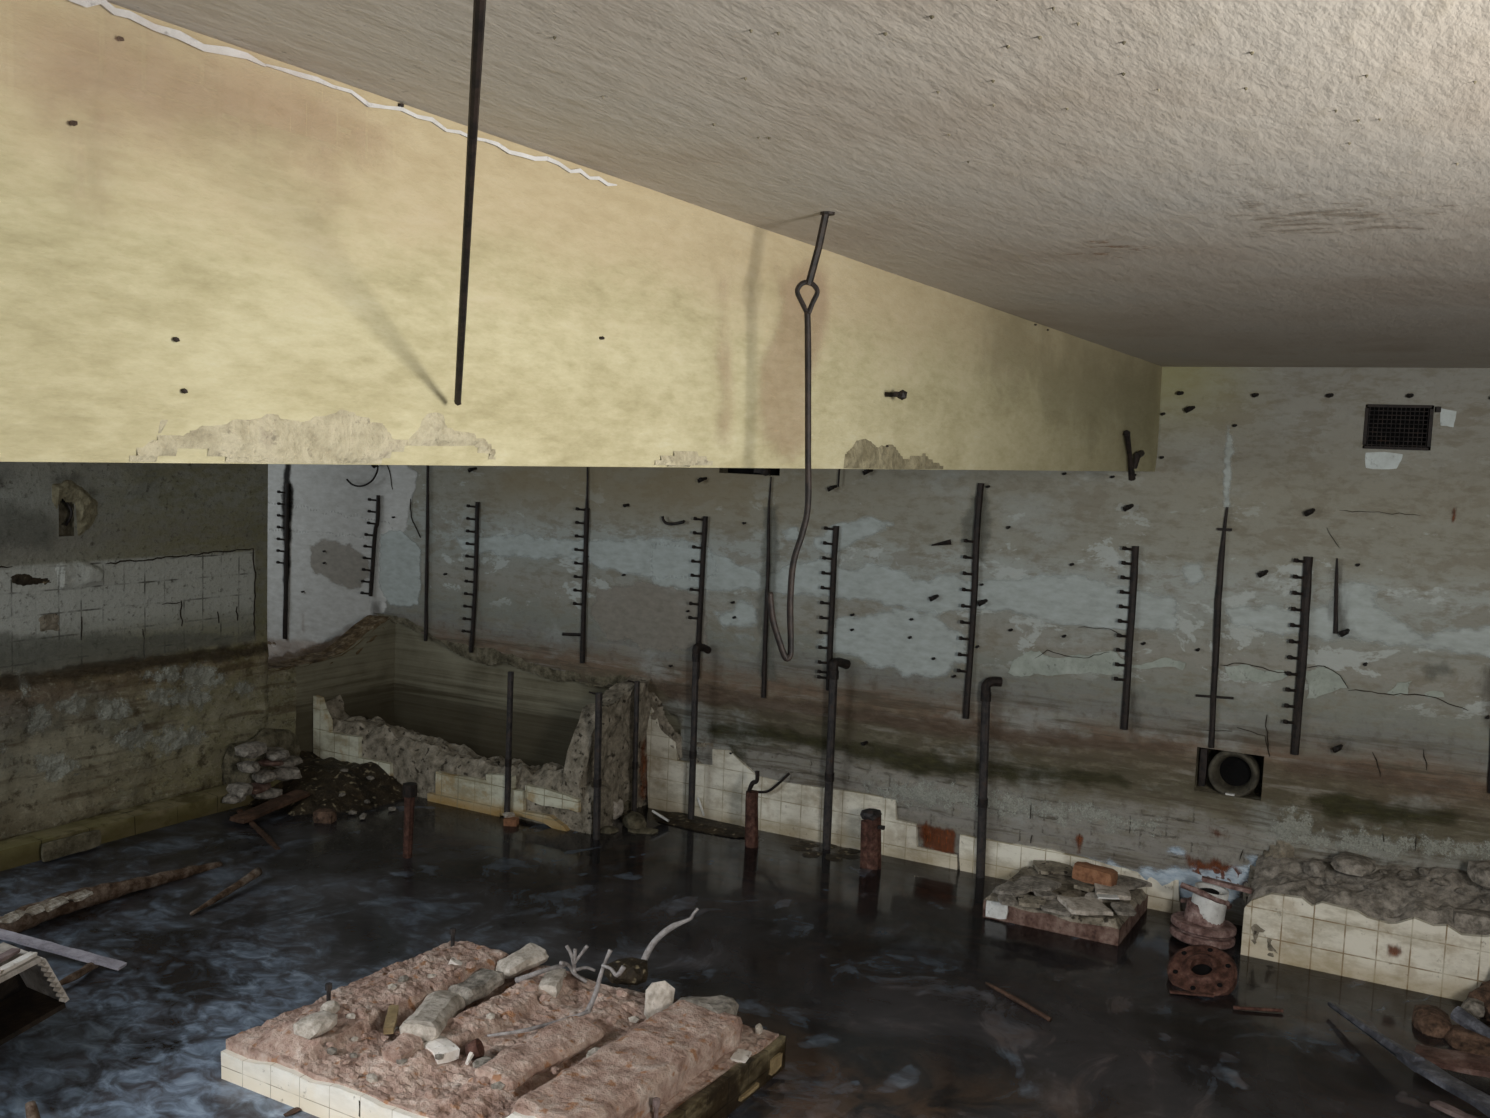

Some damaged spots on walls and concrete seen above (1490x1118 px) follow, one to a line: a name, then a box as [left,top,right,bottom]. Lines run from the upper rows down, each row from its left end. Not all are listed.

crack [69,0,617,186]
flaking render [655,451,713,467]
flaking render [844,439,943,469]
peeling [130,410,628,687]
flaking render [11,574,51,586]
flaking render [38,613,60,632]
peeling [457,517,1186,677]
peeling [1227,583,1490,657]
peeling [1306,666,1347,699]
crack [1223,663,1468,711]
flaking render [647,692,682,760]
corrosion [920,824,955,854]